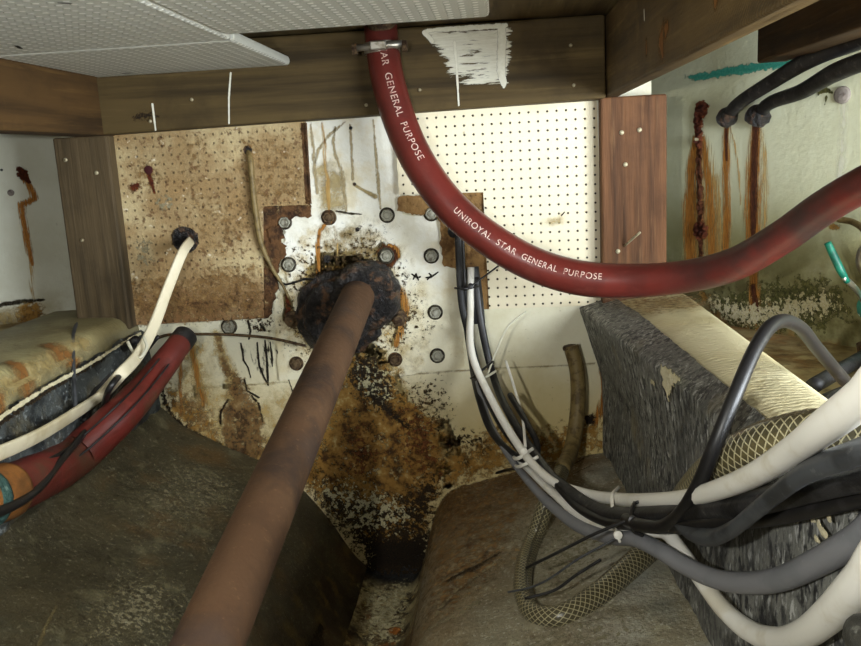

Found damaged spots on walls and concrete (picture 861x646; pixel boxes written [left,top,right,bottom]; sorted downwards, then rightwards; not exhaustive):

corrosion [16,166,39,299]
corrosion [683,100,767,260]
water stain [697,273,857,334]
corrosion [214,331,266,459]
water stain [305,352,450,548]
water stain [457,424,567,481]
peeling [651,364,680,402]